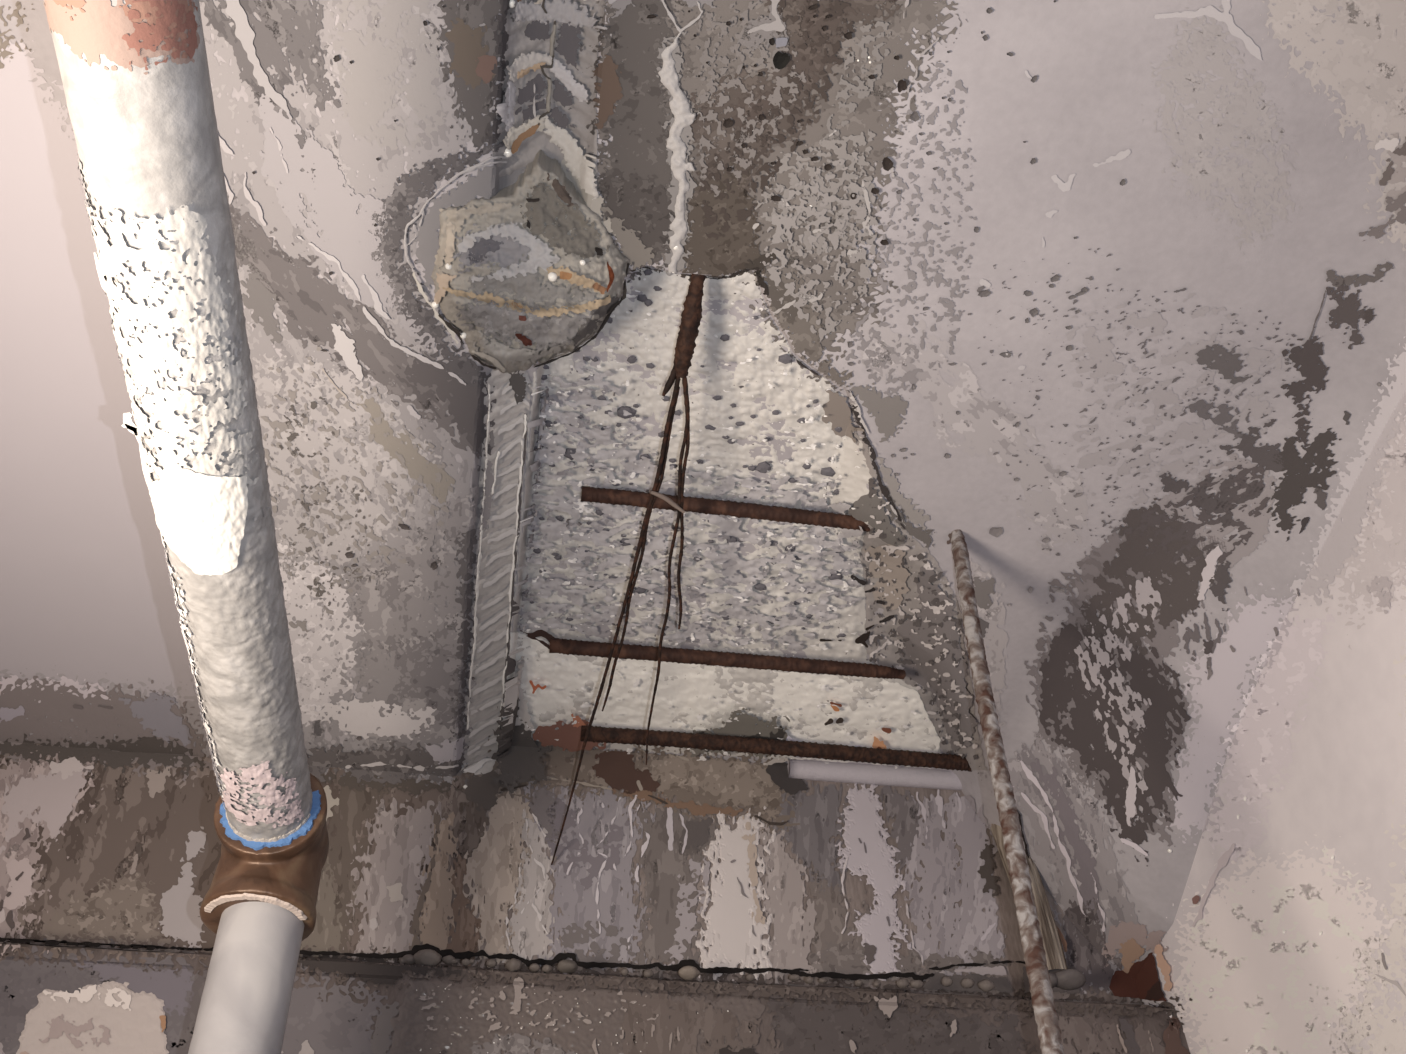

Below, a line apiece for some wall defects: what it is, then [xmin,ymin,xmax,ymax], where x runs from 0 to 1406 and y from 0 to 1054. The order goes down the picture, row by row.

water stain [909,80,977,227]
water stain [1141,0,1406,255]
water stain [1326,262,1393,350]
water stain [847,453,979,751]
spalling [503,268,1064,1054]
water stain [693,708,790,740]
rust [825,702,844,725]
rust [872,728,891,749]
water stain [0,673,222,1054]
crack [0,937,214,951]
crack [299,943,1025,982]
rust [1102,920,1172,1001]